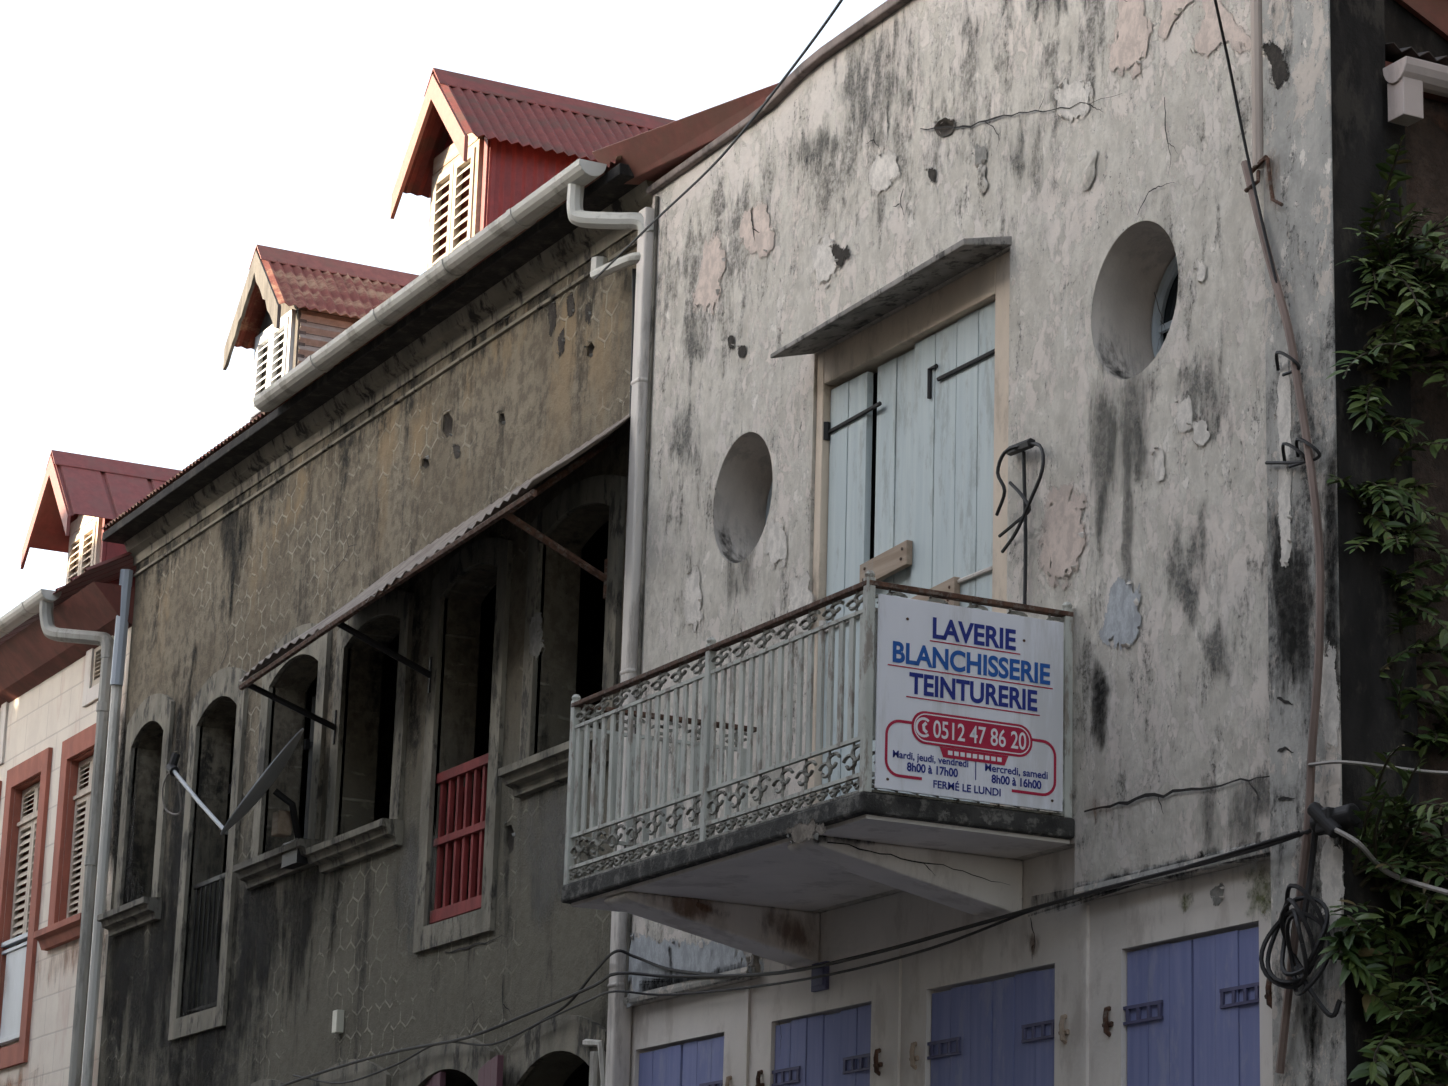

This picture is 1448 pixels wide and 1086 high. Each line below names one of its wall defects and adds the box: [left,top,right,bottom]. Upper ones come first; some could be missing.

crack [920,92,1123,150]
peeling [692,201,775,315]
peeling [810,233,850,289]
leakage [1090,358,1145,580]
leakage [1270,444,1341,696]
leakage [1091,663,1108,747]
crack [1084,746,1295,818]
leakage [102,648,341,1086]